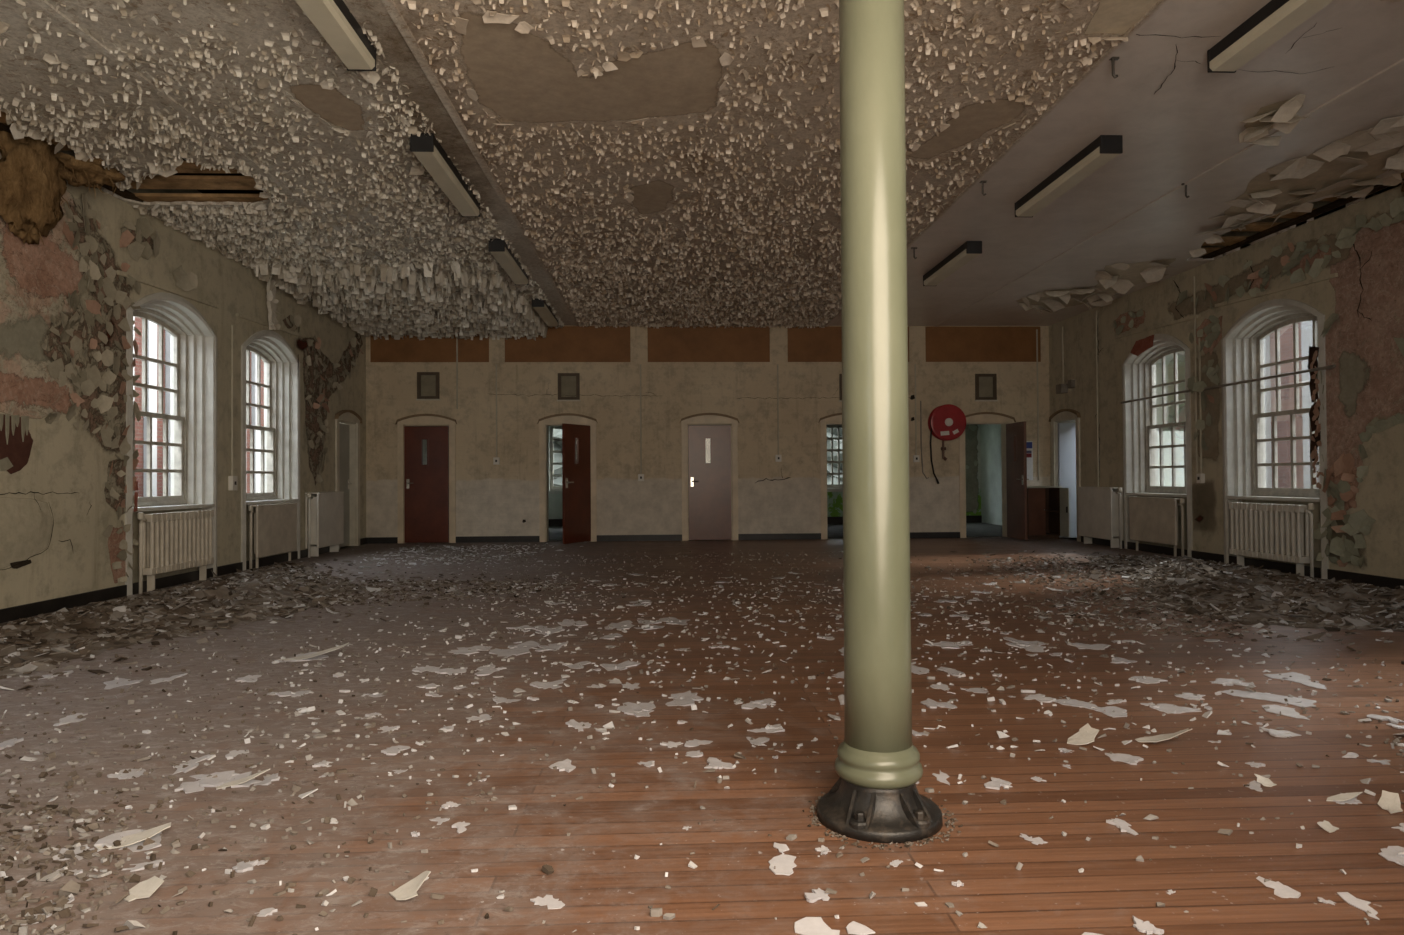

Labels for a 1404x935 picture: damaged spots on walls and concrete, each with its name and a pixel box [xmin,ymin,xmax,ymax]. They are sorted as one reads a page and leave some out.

peeling [1239,94,1309,146]
peeling [1196,116,1404,236]
peeling [0,0,841,583]
peeling [1017,258,1176,356]
flaking render [1168,211,1404,568]
crack [0,491,92,570]